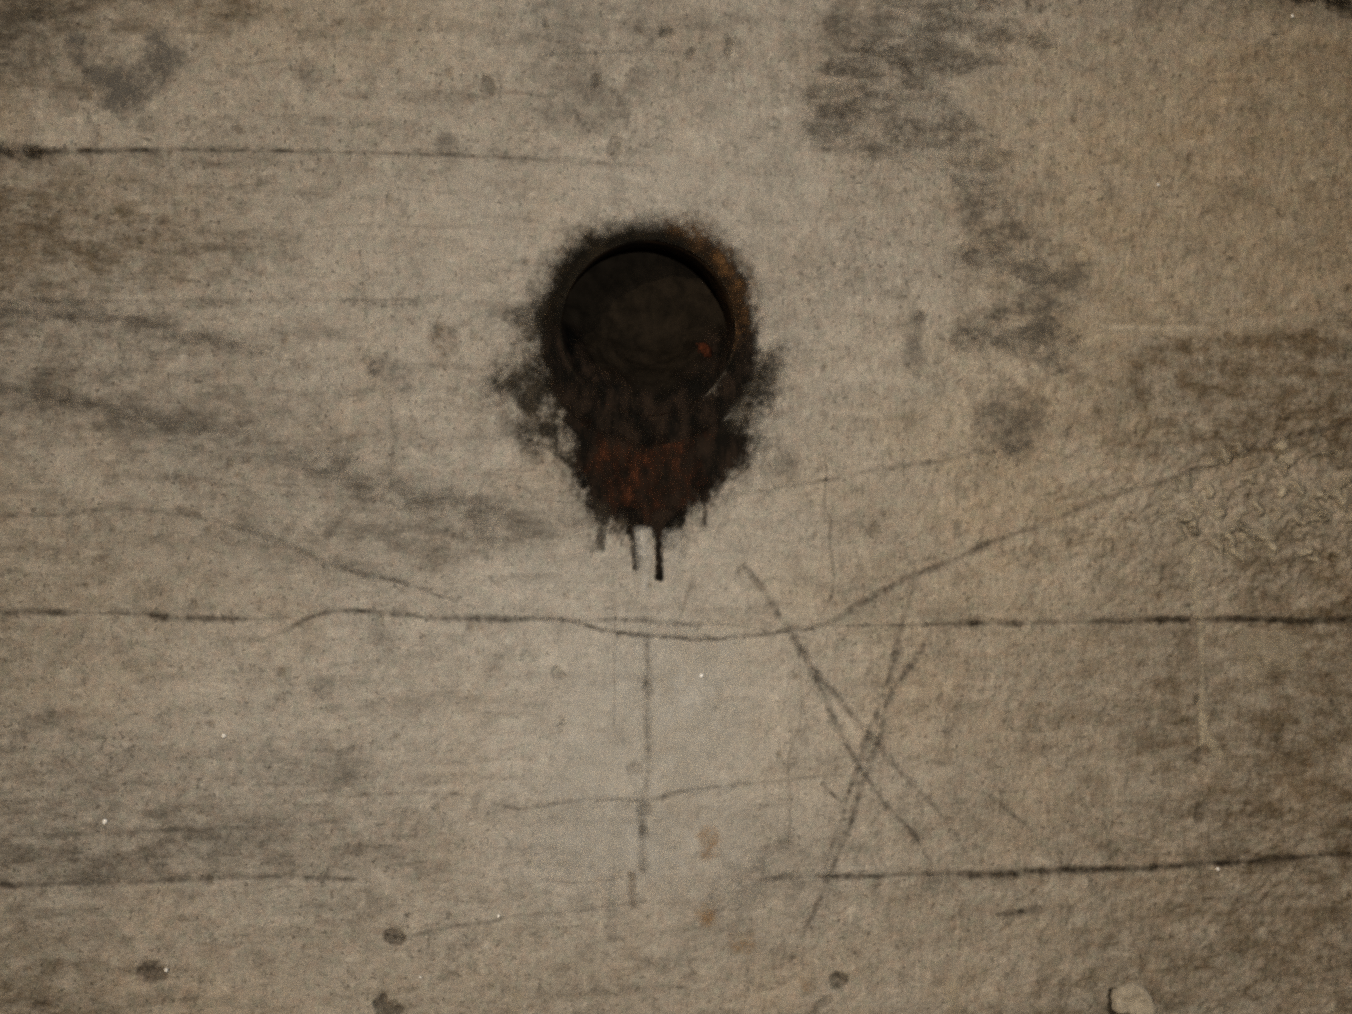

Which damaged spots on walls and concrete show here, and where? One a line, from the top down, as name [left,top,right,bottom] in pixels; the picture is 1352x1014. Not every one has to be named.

water stain [819,4,957,117]
water stain [990,266,1086,372]
corrosion [501,225,776,589]
crack [1148,615,1346,623]
crack [969,855,1300,877]